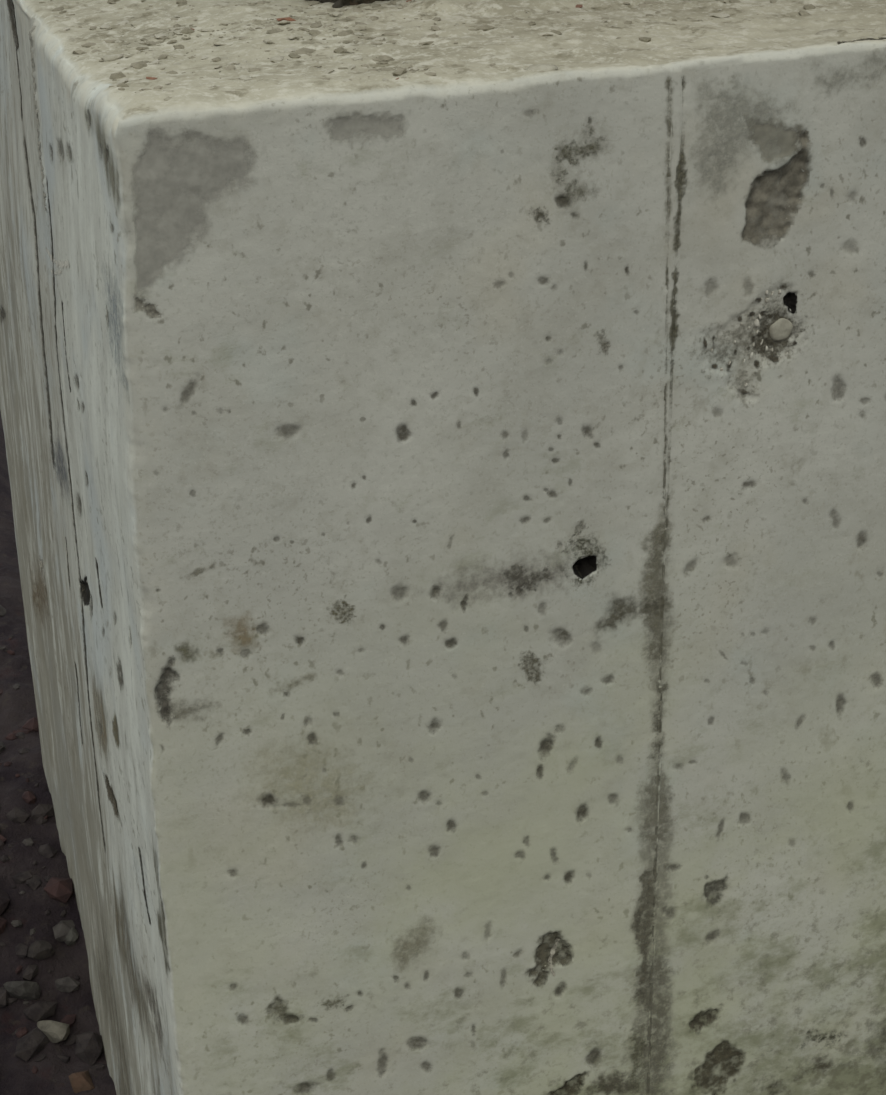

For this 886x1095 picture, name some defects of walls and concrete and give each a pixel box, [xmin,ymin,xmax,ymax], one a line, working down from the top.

water stain [667,148,687,250]
spalling [742,131,810,245]
water stain [665,264,679,373]
spalling [704,285,801,394]
water stain [643,487,669,658]
spalling [527,932,572,986]
water stain [632,871,665,1028]
water stain [598,1038,665,1094]
spalling [692,1041,744,1095]